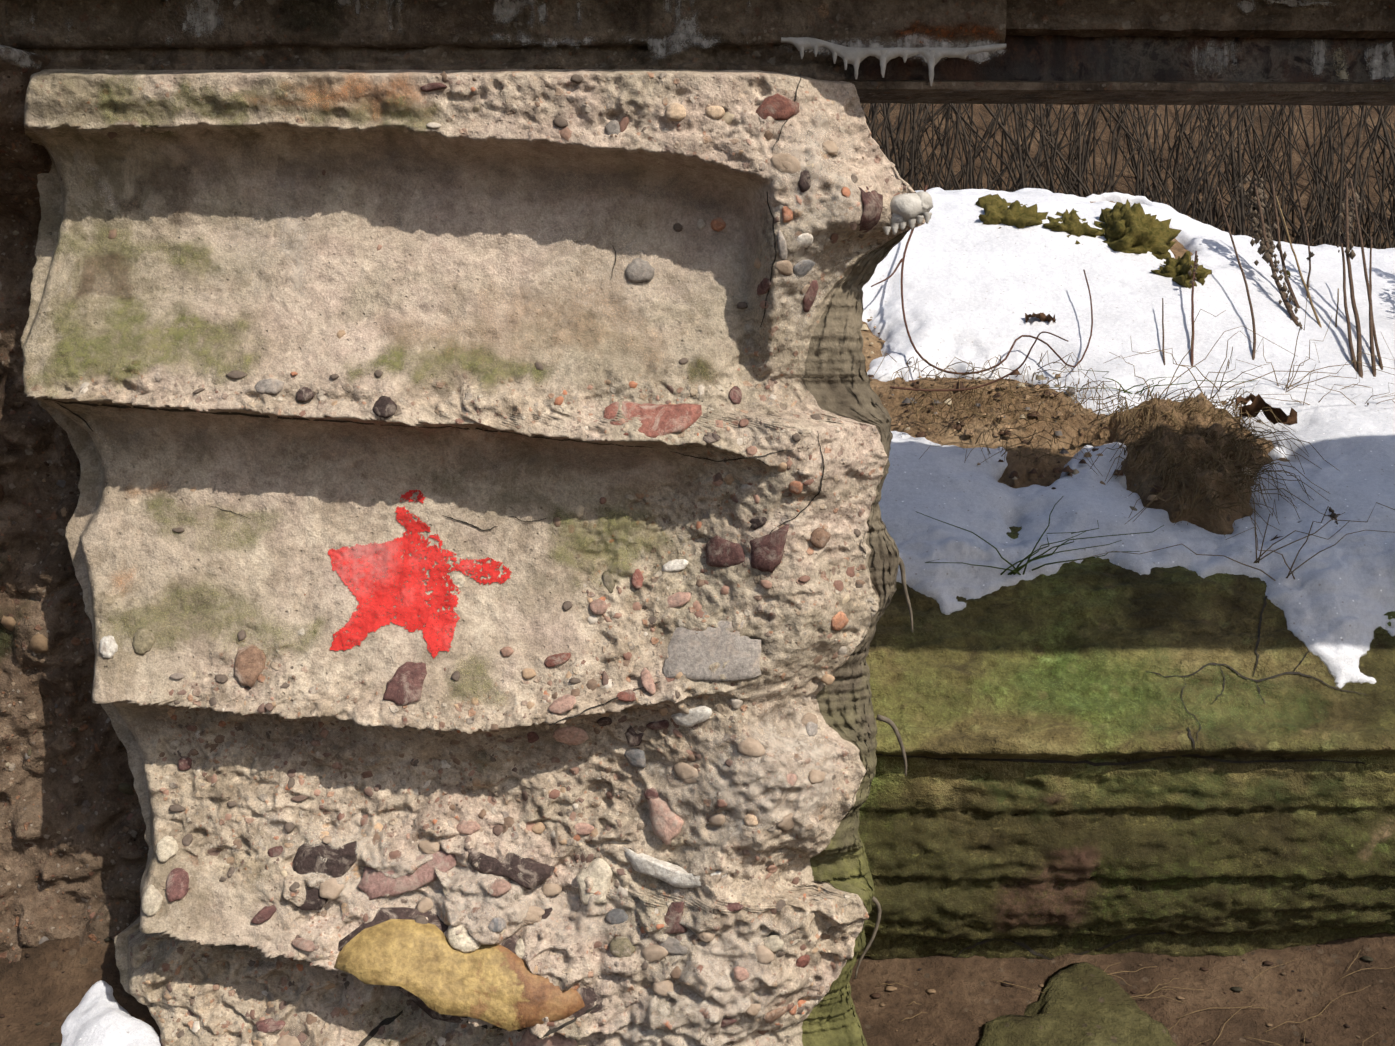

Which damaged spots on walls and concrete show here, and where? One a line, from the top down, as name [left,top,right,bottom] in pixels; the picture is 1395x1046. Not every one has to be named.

damp [648,0,718,57]
rust [894,22,999,46]
damp [781,35,1006,86]